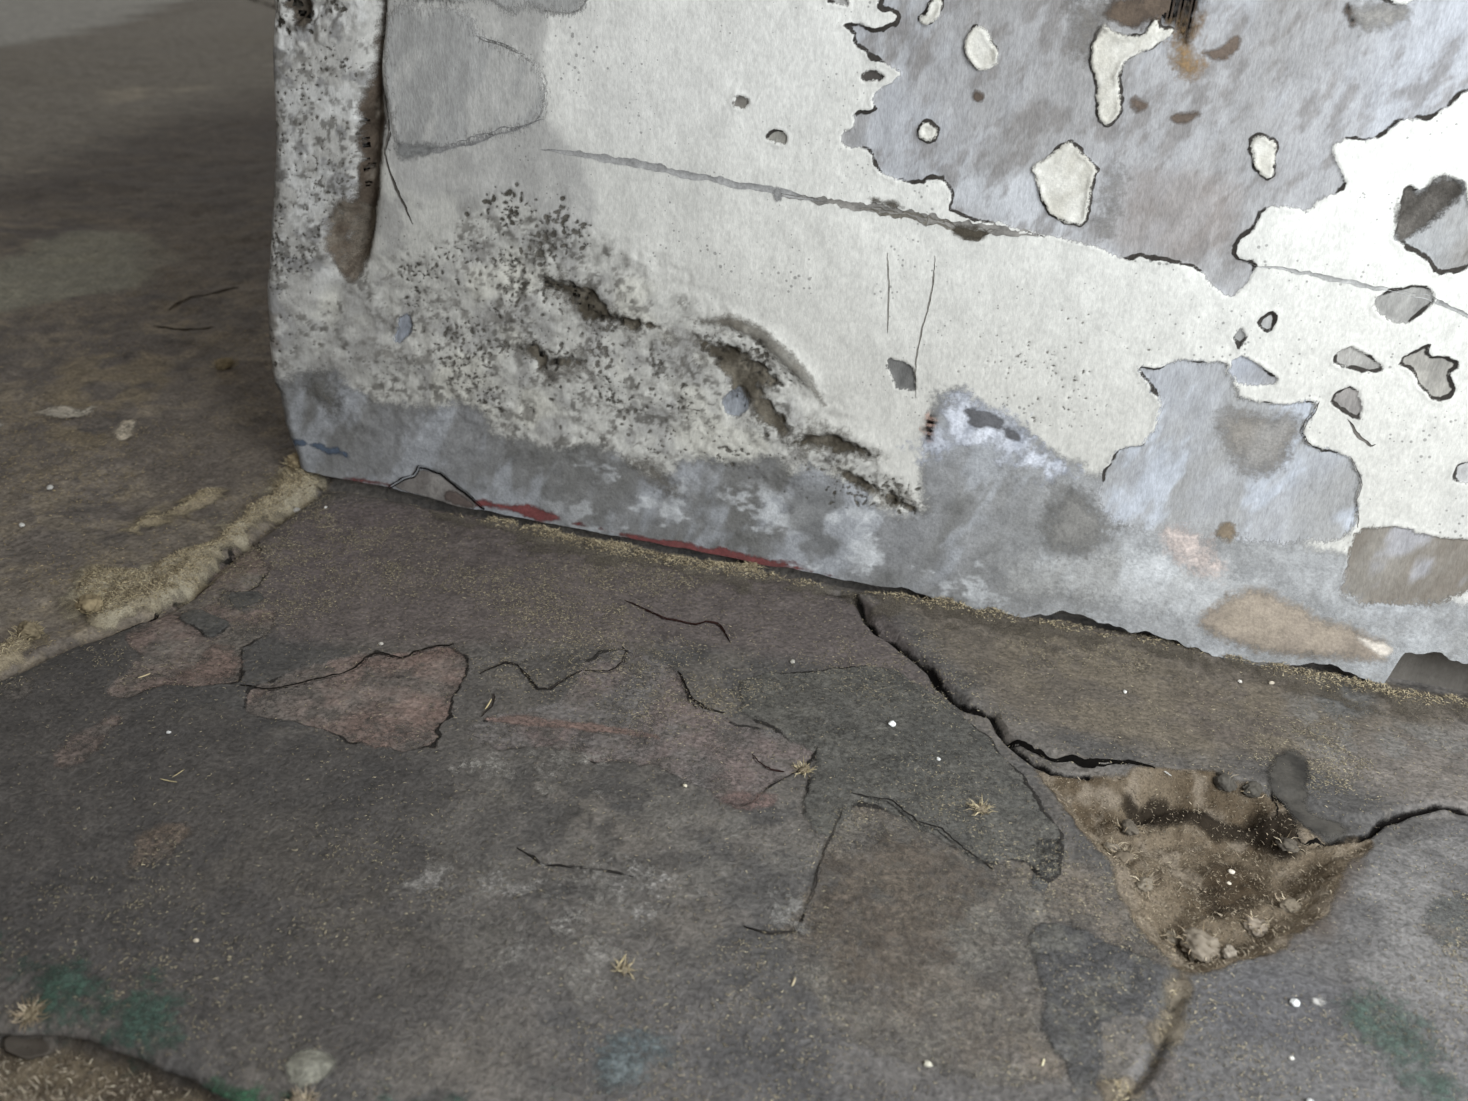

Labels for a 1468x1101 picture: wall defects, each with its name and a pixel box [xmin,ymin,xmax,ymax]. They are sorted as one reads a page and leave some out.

flaking render [269,0,374,289]
peeling [828,0,1468,297]
peeling [271,174,1468,684]
crack [625,600,731,643]
crack [240,643,454,691]
crack [480,646,627,717]
crack [678,671,726,714]
crack [834,594,1155,781]
crack [752,754,784,772]
crack [1271,792,1468,852]
crack [517,848,634,877]
crack [743,792,993,935]